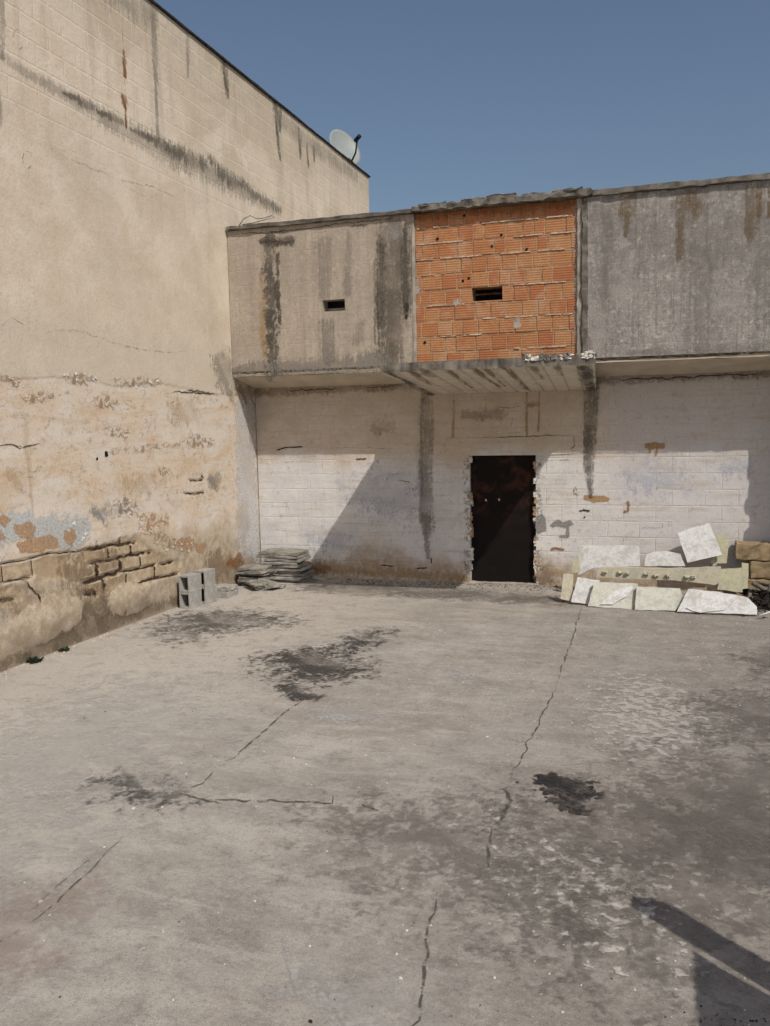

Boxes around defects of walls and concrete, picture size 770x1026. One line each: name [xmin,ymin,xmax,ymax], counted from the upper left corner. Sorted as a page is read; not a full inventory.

water stain [142,14,187,162]
peeling [1,376,60,403]
peeling [63,373,97,385]
water stain [208,234,434,580]
water stain [445,367,529,390]
peeling [96,427,215,460]
water stain [583,425,597,466]
peeling [0,509,91,553]
peeling [114,497,207,553]
spalling [463,448,500,582]
crack [411,898,437,1026]